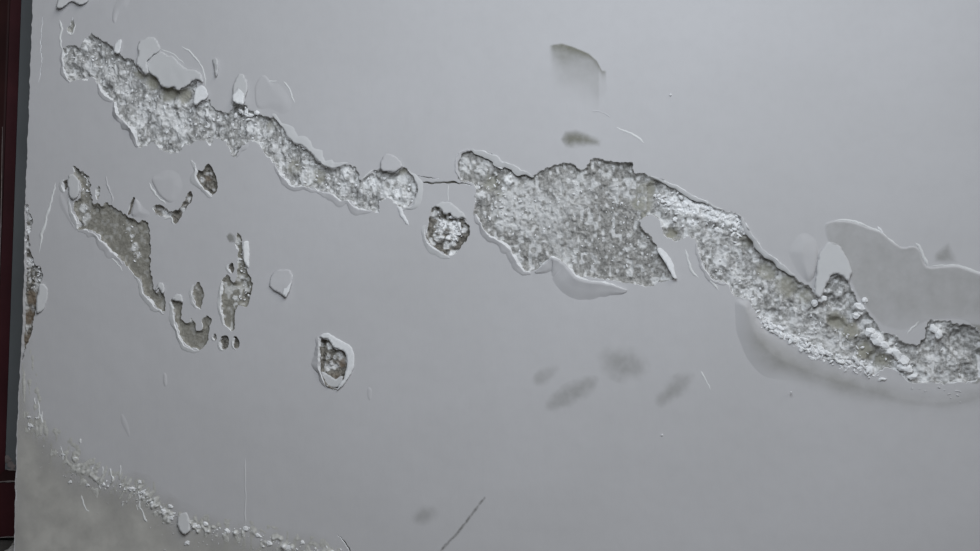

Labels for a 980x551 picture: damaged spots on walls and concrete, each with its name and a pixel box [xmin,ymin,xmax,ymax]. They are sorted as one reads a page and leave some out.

flaking render [60,20,423,225]
flaking render [23,204,48,357]
flaking render [59,166,253,353]
water stain [15,349,351,551]
flaking render [311,333,354,390]
flaking render [421,149,980,403]